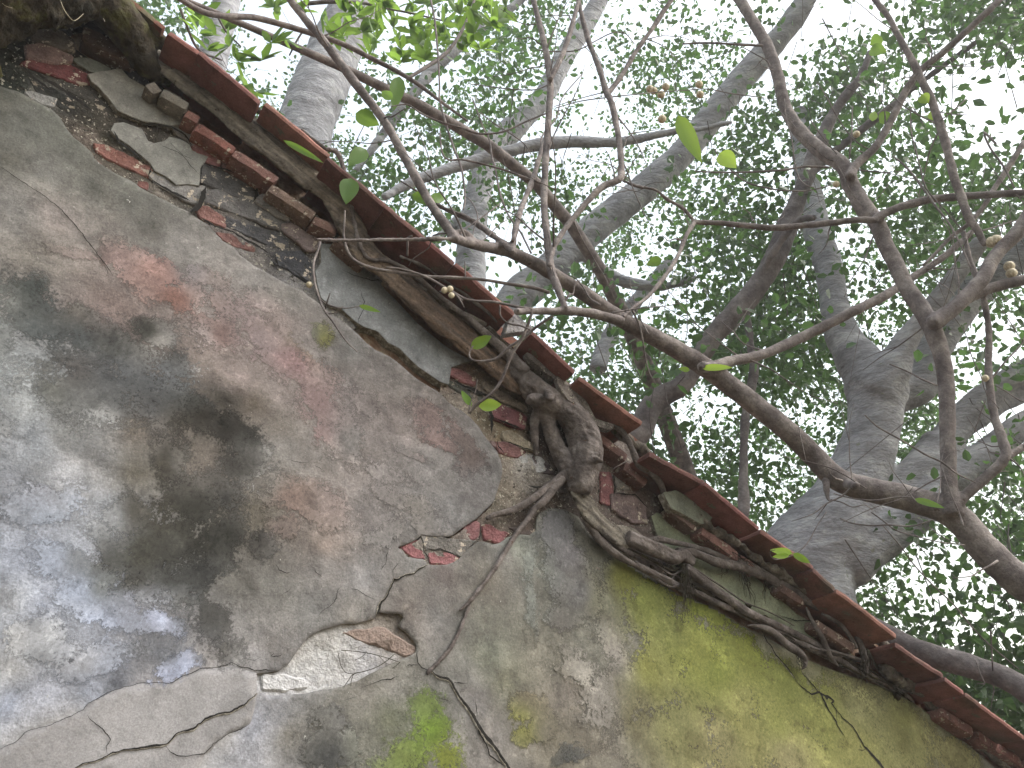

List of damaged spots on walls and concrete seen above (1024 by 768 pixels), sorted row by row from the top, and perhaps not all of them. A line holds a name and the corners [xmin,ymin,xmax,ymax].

flaking render [0,21,357,330]
spalling [500,308,533,338]
leakage [0,232,492,688]
flaking render [399,357,613,565]
flaking render [523,353,712,537]
crack [276,547,428,617]
crack [1,652,284,768]
flaking render [257,614,416,696]
crack [346,650,510,768]